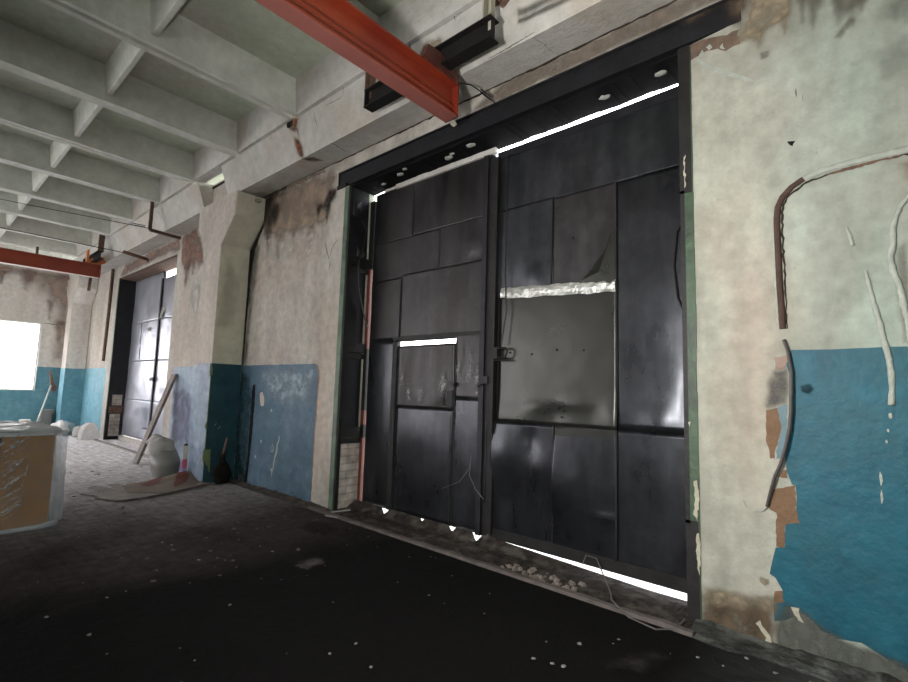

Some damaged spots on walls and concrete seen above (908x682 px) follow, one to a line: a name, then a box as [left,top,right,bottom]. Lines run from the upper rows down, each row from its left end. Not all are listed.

damp [478,0,715,108]
flaking render [689,0,791,60]
corrosion [291,116,321,161]
damp [264,175,335,255]
peeling [766,404,787,459]
peeling [770,470,800,548]